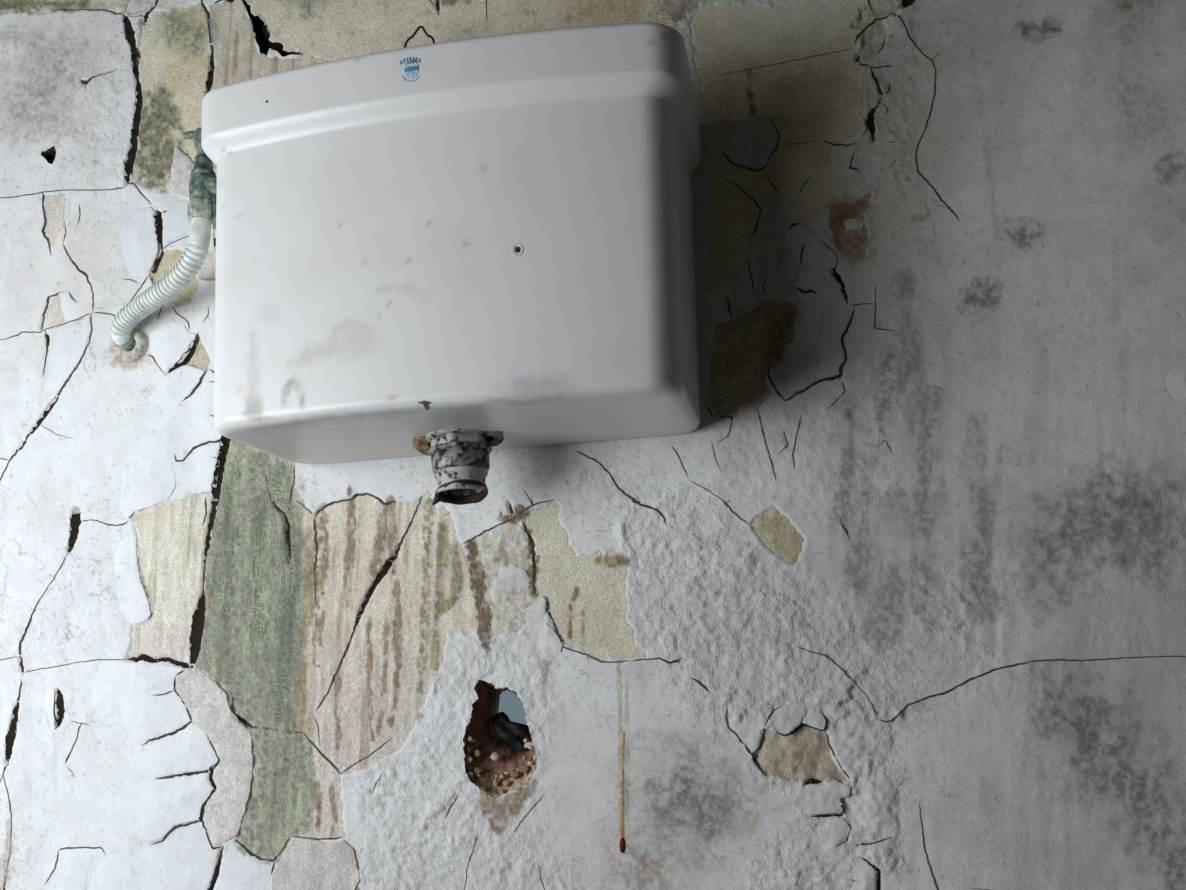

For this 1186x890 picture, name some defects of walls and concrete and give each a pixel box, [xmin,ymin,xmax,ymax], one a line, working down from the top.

flaking render [41,146,56,164]
flaking render [121,0,904,294]
peeling [41,291,90,412]
crack [0,0,344,890]
crack [671,223,893,524]
crack [230,465,422,793]
flaking render [48,321,646,890]
corrosion [617,665,627,853]
crack [463,489,850,817]
flaking render [729,705,851,846]
crack [796,646,1186,723]
damp [1046,692,1169,846]